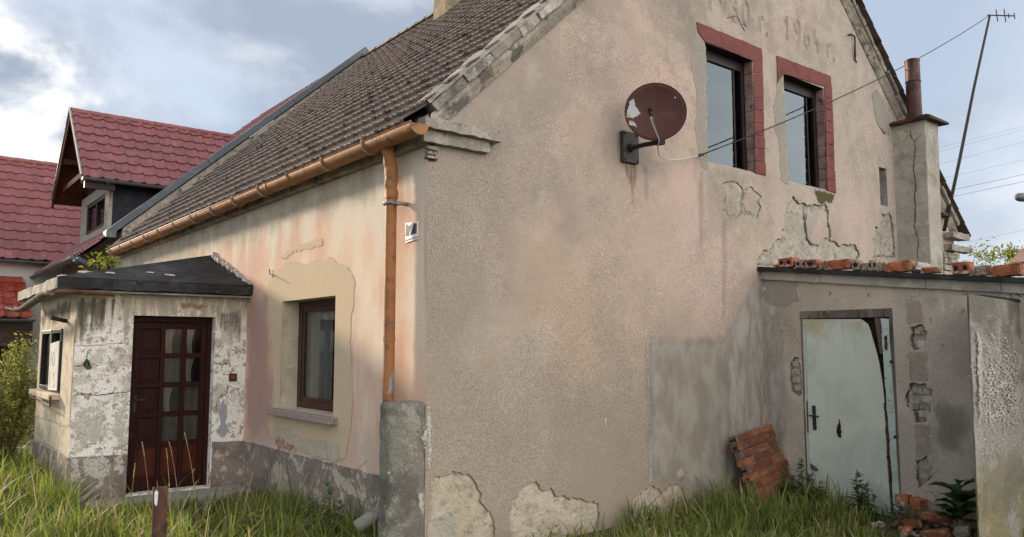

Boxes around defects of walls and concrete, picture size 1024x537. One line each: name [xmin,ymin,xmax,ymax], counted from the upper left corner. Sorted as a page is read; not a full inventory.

spalling [723,181,761,219]
crack [910,133,936,257]
spalling [757,196,860,266]
spalling [872,209,895,258]
spalling [910,324,927,350]
spalling [790,357,802,396]
spalling [905,382,933,423]
peeling [68,397,130,482]
spalling [418,405,495,537]
spalling [509,481,600,537]
spalling [632,483,684,522]
spalling [904,455,937,513]